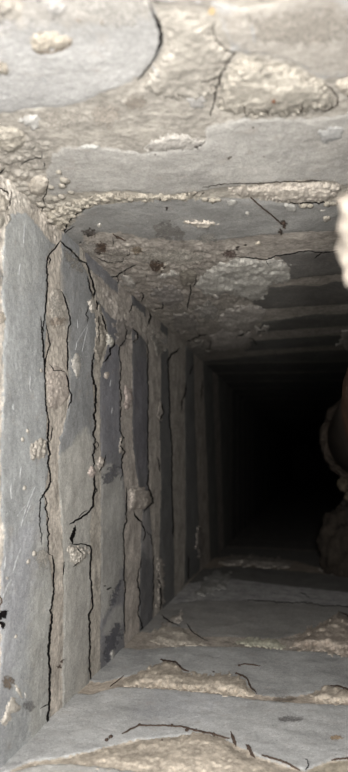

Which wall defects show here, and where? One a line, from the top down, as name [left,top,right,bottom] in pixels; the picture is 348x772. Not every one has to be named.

crack [200,21,236,115]
crack [39,205,212,722]